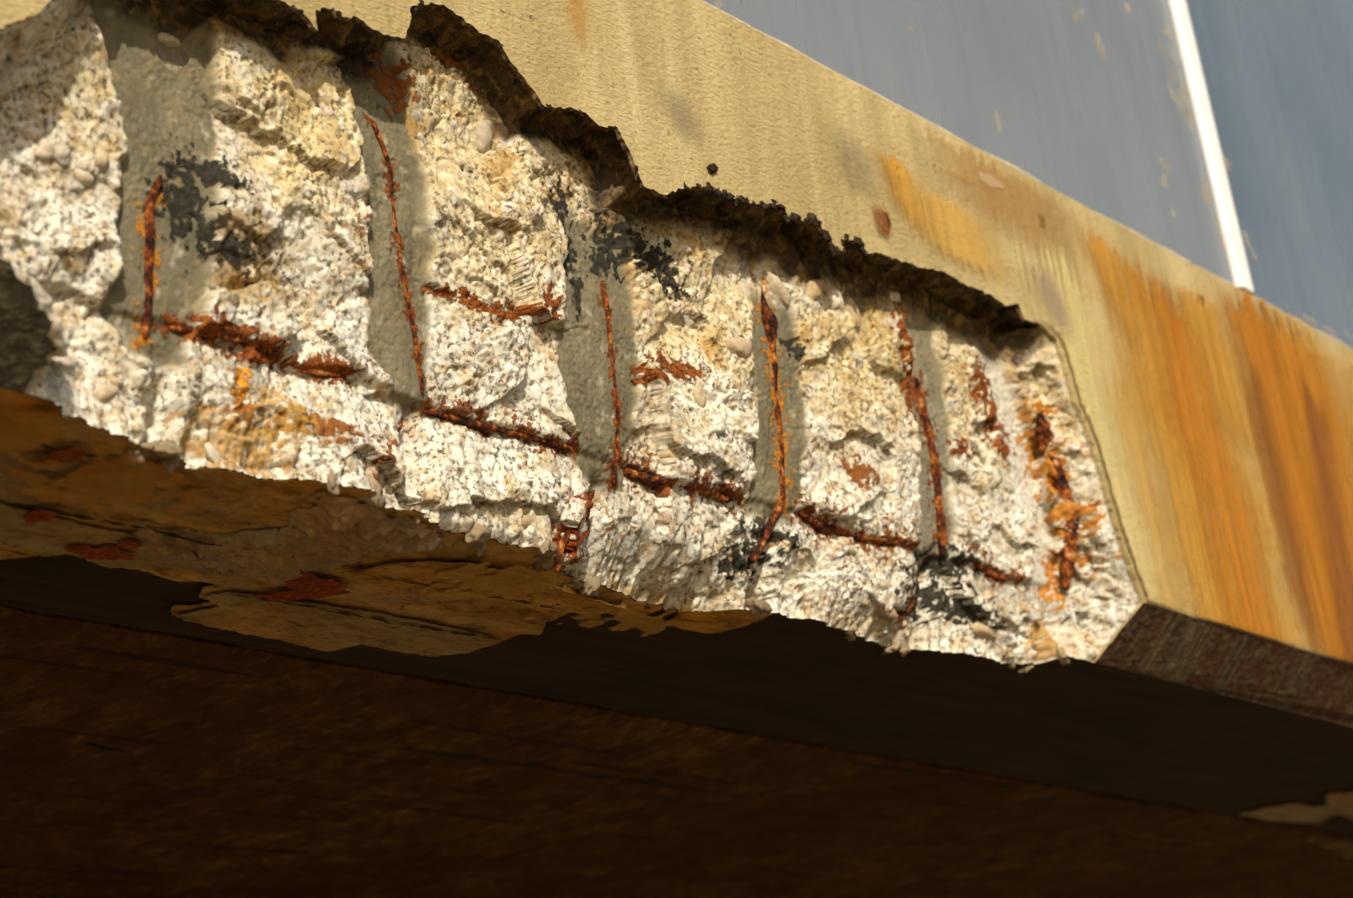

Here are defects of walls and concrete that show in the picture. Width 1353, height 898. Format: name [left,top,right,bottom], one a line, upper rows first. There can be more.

rust [357,43,487,120]
rust [883,155,1000,277]
rust [420,282,564,326]
spalling [0,0,1140,674]
rust [629,350,729,388]
rust [840,453,886,492]
rust [888,289,922,447]
rust [942,341,1016,469]
rust [1083,227,1353,662]
rust [420,493,593,601]
rust [573,607,727,636]
peeling [1239,791,1353,867]